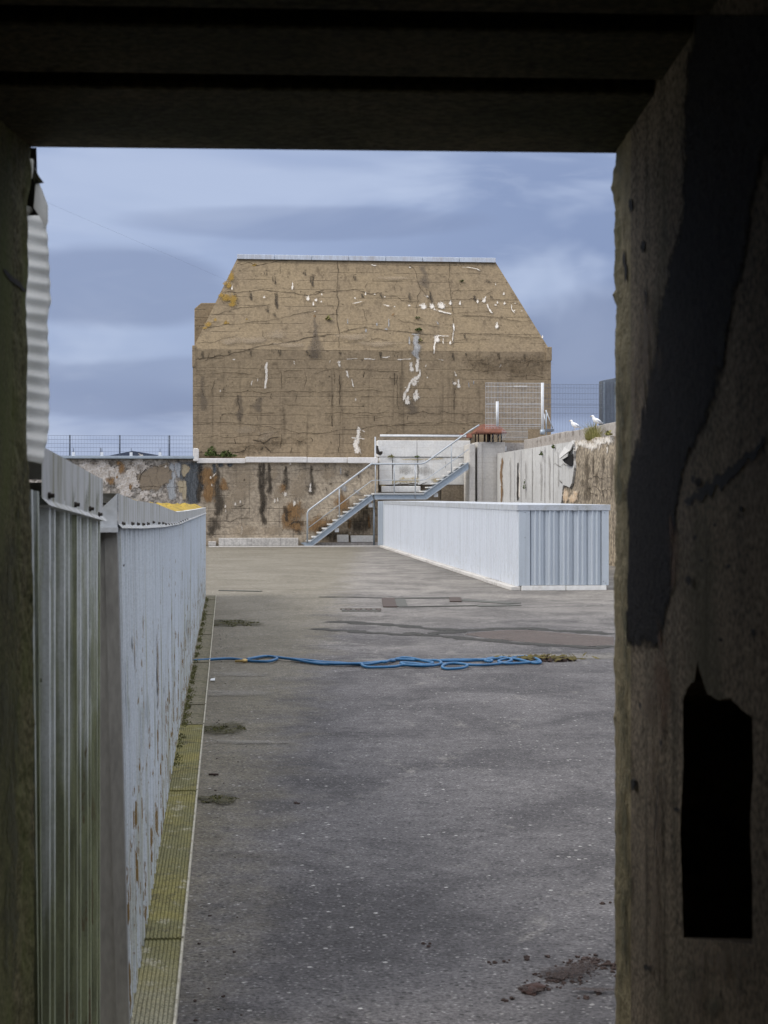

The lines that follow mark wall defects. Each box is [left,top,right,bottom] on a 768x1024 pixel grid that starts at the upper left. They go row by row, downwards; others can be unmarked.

crack [196,260,544,536]
damp [353,334,428,404]
peeling [79,453,187,502]
damp [258,463,303,533]
damp [319,507,370,540]